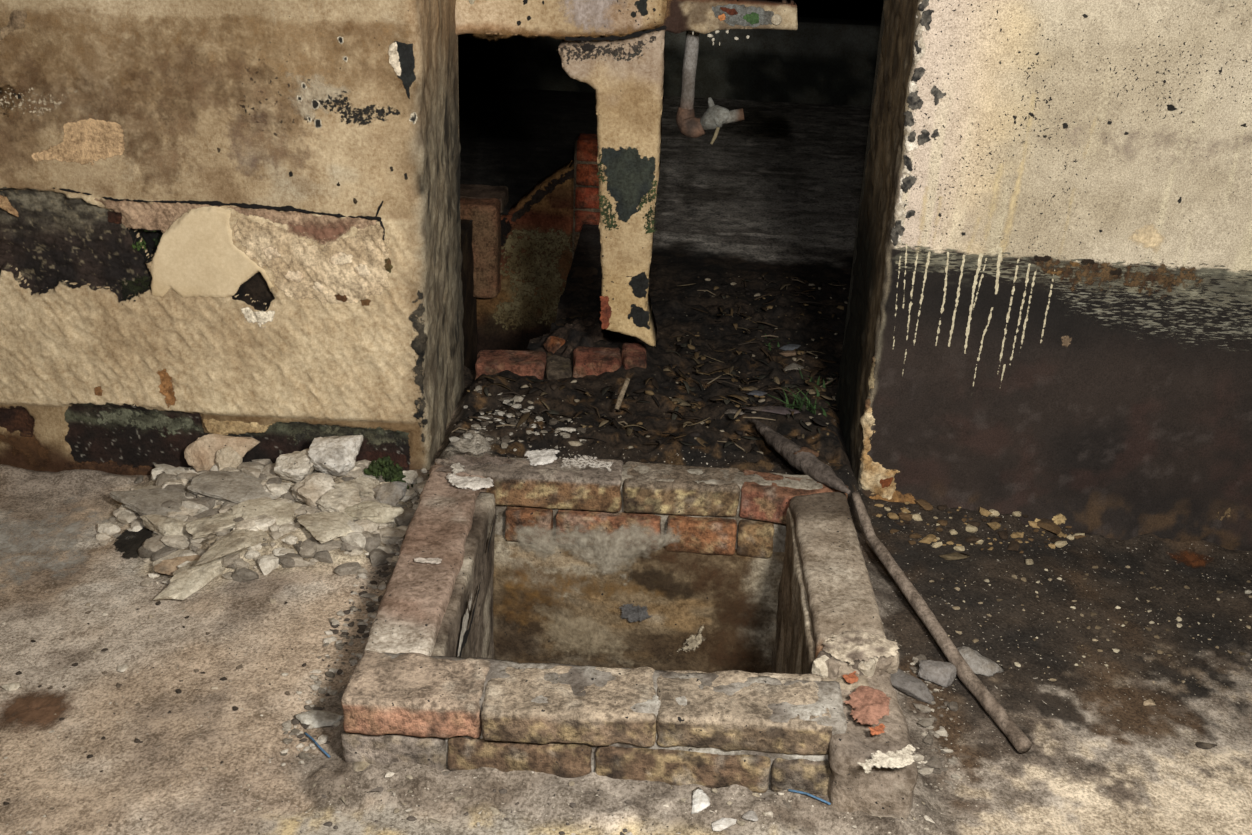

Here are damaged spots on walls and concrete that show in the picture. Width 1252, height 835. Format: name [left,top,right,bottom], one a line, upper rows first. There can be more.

leakage [0,11,417,180]
peeling [388,41,416,99]
peeling [891,0,946,247]
flaking render [0,187,393,327]
crack [53,187,385,240]
leakage [893,244,931,376]
leakage [935,163,1036,386]
flaking render [203,418,272,436]
spalling [294,357,918,821]
peeling [711,811,758,831]